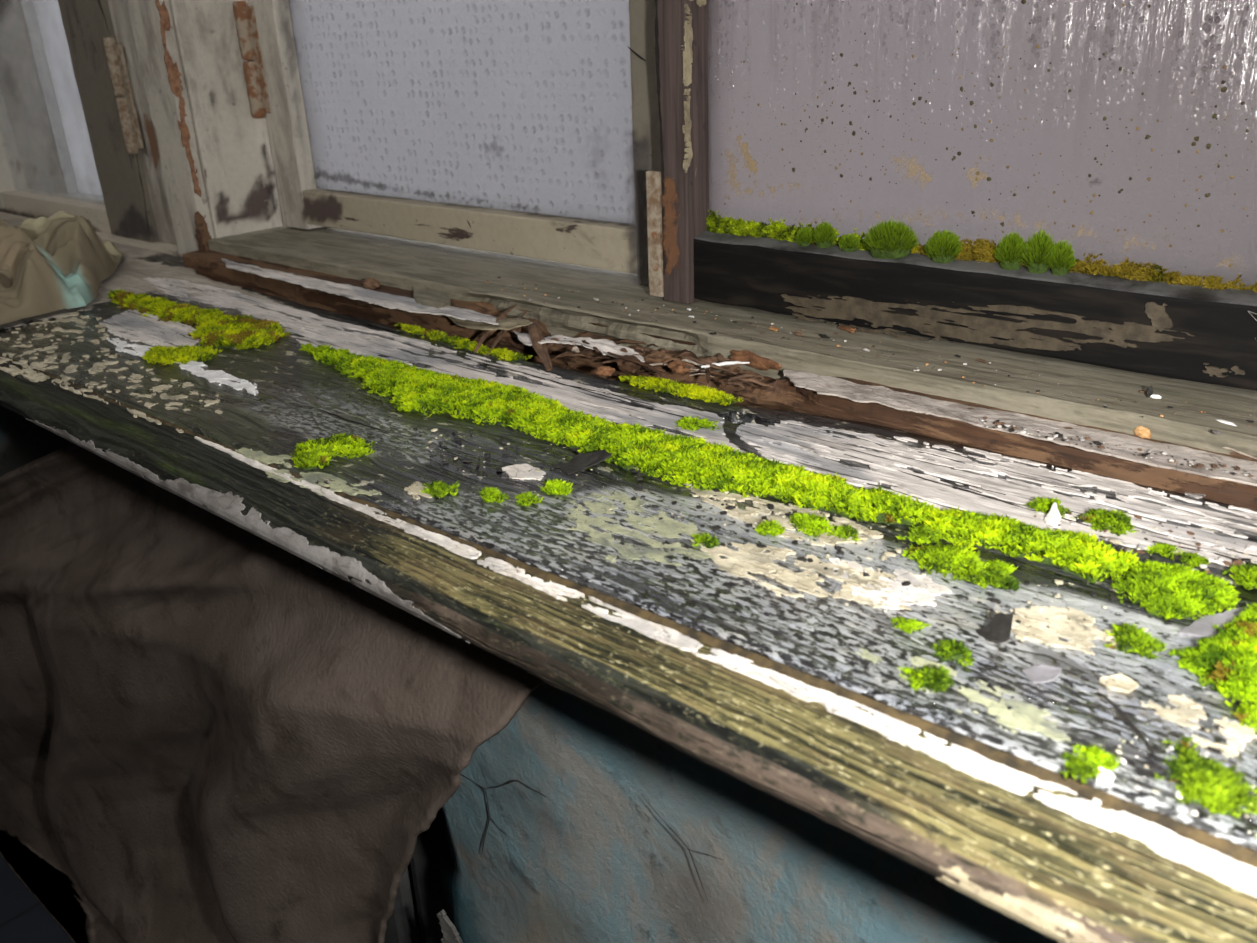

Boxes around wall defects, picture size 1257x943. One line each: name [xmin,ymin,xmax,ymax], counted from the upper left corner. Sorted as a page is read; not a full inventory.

rust [144,115,159,169]
damp [718,30,1248,252]
peeling [0,309,258,425]
peeling [221,258,645,362]
peeling [143,277,1257,567]
peeling [25,418,470,643]
peeling [176,429,1257,897]
flaking render [437,909,463,943]
peeling [936,866,1108,943]